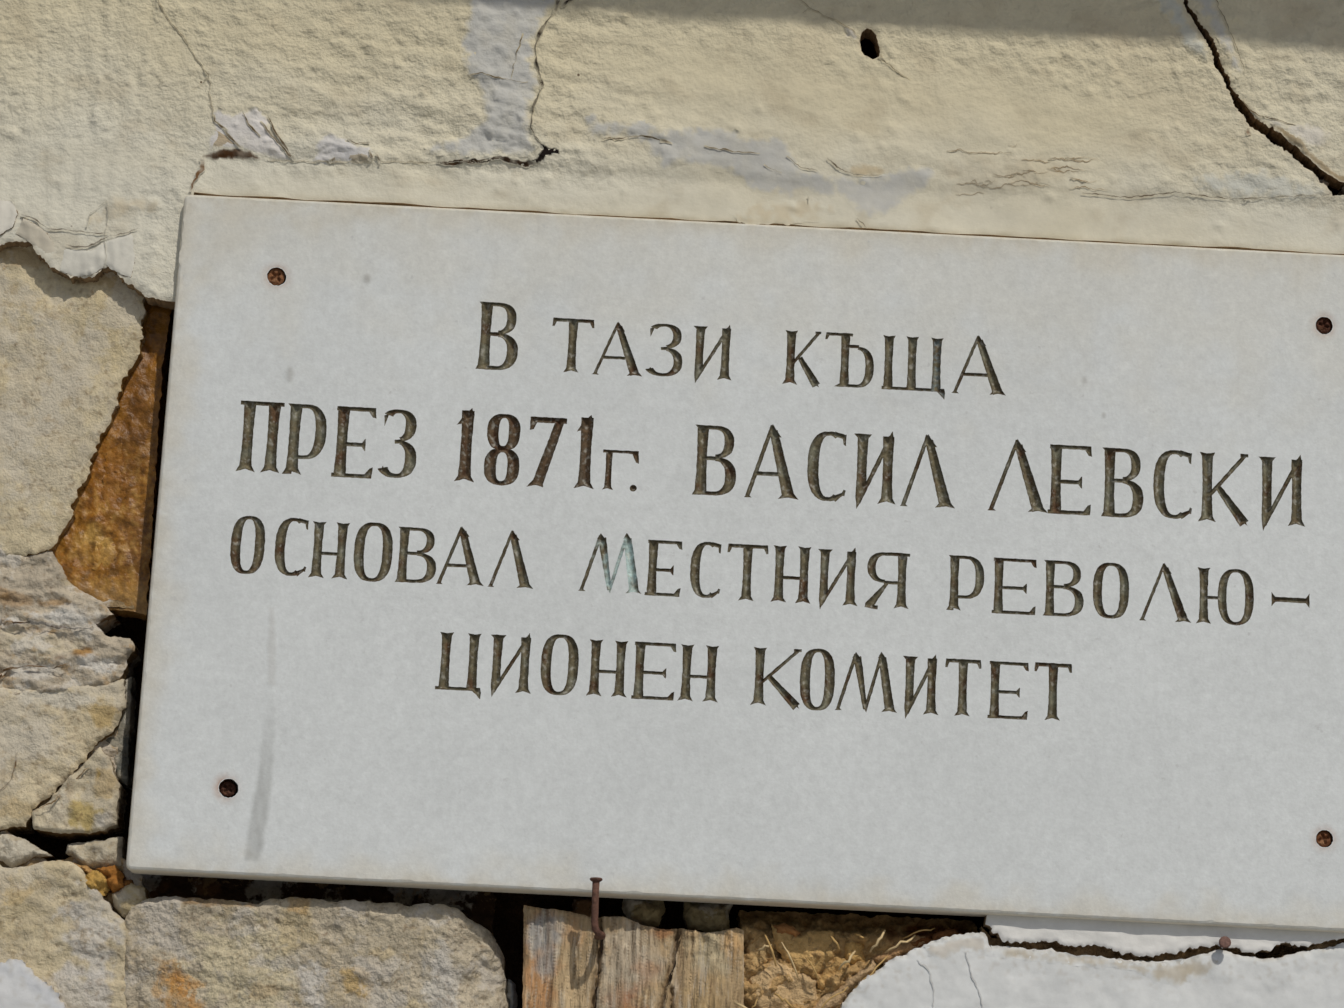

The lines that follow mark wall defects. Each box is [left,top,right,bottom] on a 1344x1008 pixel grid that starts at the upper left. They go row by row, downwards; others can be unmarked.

crack [157,0,214,121]
crack [267,0,573,168]
crack [801,0,912,80]
spalling [189,106,295,192]
spalling [311,131,381,165]
crack [1214,65,1344,196]
peeling [0,198,138,278]
peeling [925,936,992,960]